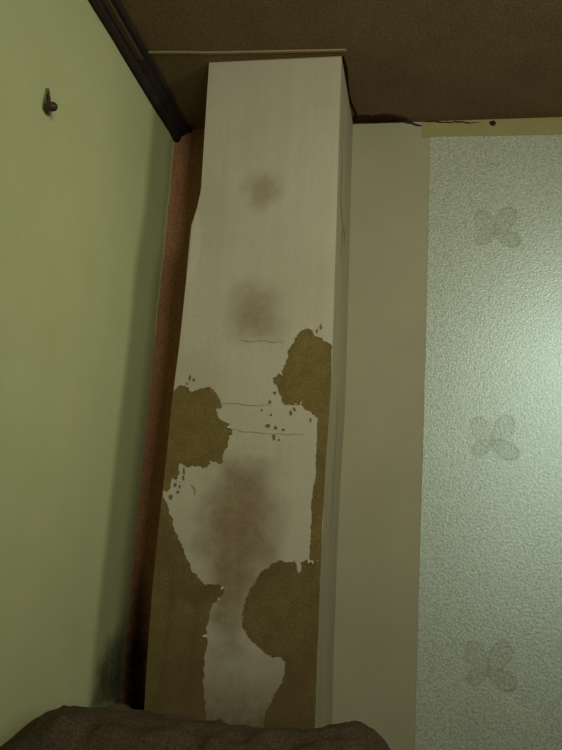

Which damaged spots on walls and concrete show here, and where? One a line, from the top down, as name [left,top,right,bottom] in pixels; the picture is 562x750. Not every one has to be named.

crack [340,56,479,262]
flaking render [120,129,205,704]
peeling [308,405,330,564]
peeling [265,645,318,729]